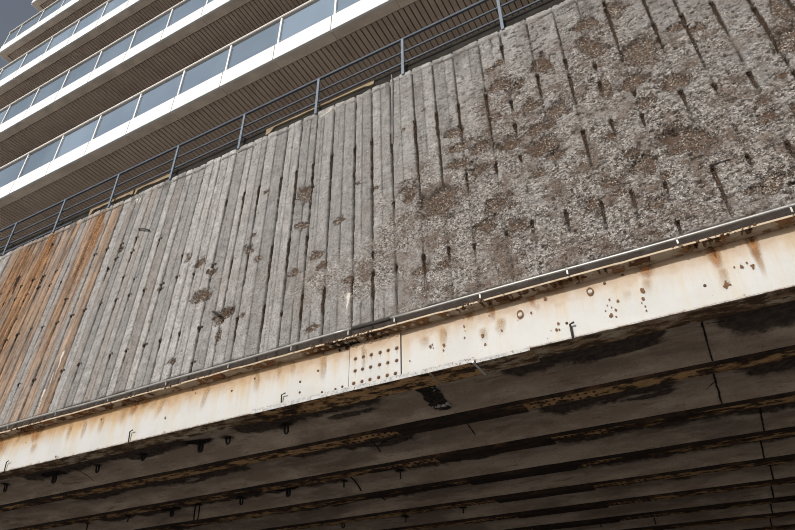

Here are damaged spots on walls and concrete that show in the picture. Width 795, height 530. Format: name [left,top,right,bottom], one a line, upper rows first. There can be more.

rust [677,216,795,269]
rust [597,256,651,274]
rust [479,275,587,316]
rust [300,317,431,356]
damp [501,330,665,376]
crack [701,320,730,404]
damp [716,300,795,335]
damp [229,398,380,433]
spalling [415,384,451,410]
damp [540,381,677,415]
damp [21,440,188,481]
crack [759,407,775,527]